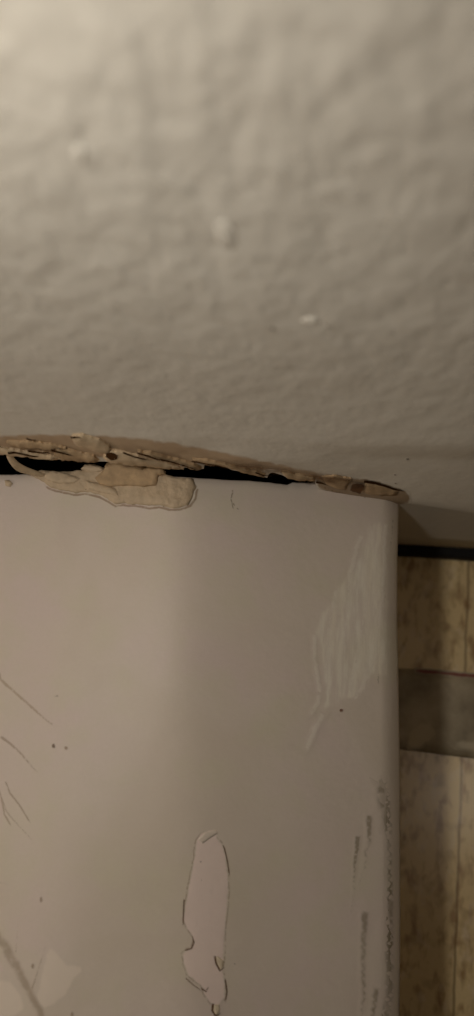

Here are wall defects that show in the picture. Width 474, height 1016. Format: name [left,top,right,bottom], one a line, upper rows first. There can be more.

crack [0,455,108,475]
peeling [0,432,412,512]
crack [145,465,328,516]
crack [364,481,402,491]
peeling [180,828,231,1016]